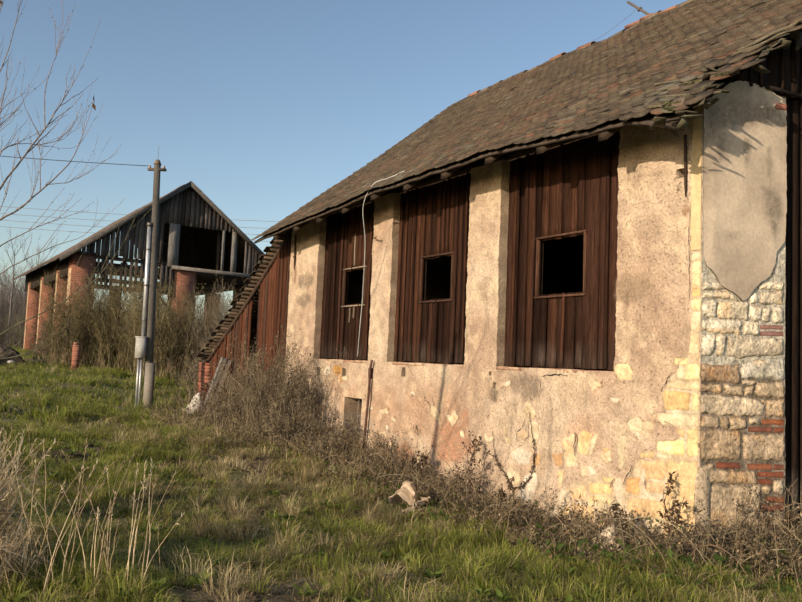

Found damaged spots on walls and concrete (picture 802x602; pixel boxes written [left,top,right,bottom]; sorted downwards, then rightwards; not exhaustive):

spalling [547,19,802,555]
spalling [431,406,465,439]
spalling [507,398,541,506]